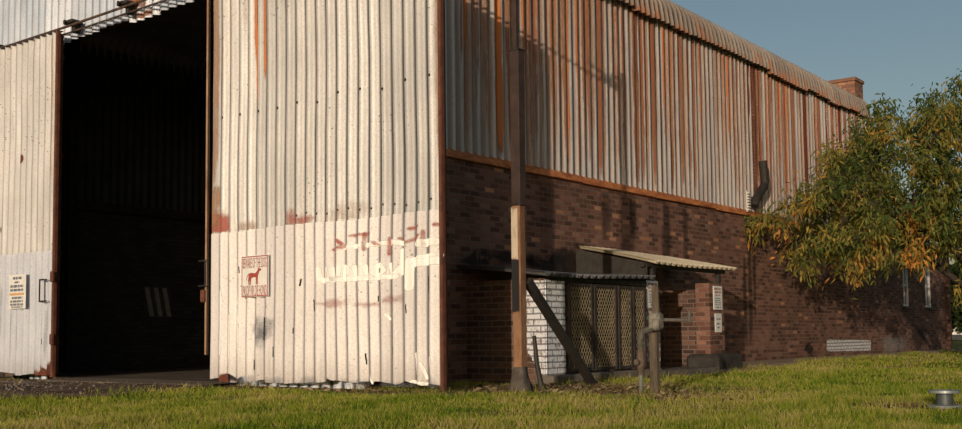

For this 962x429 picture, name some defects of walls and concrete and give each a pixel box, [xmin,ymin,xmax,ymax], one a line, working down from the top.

rust [212,0,230,233]
rust [255,0,267,99]
rust [460,0,859,210]